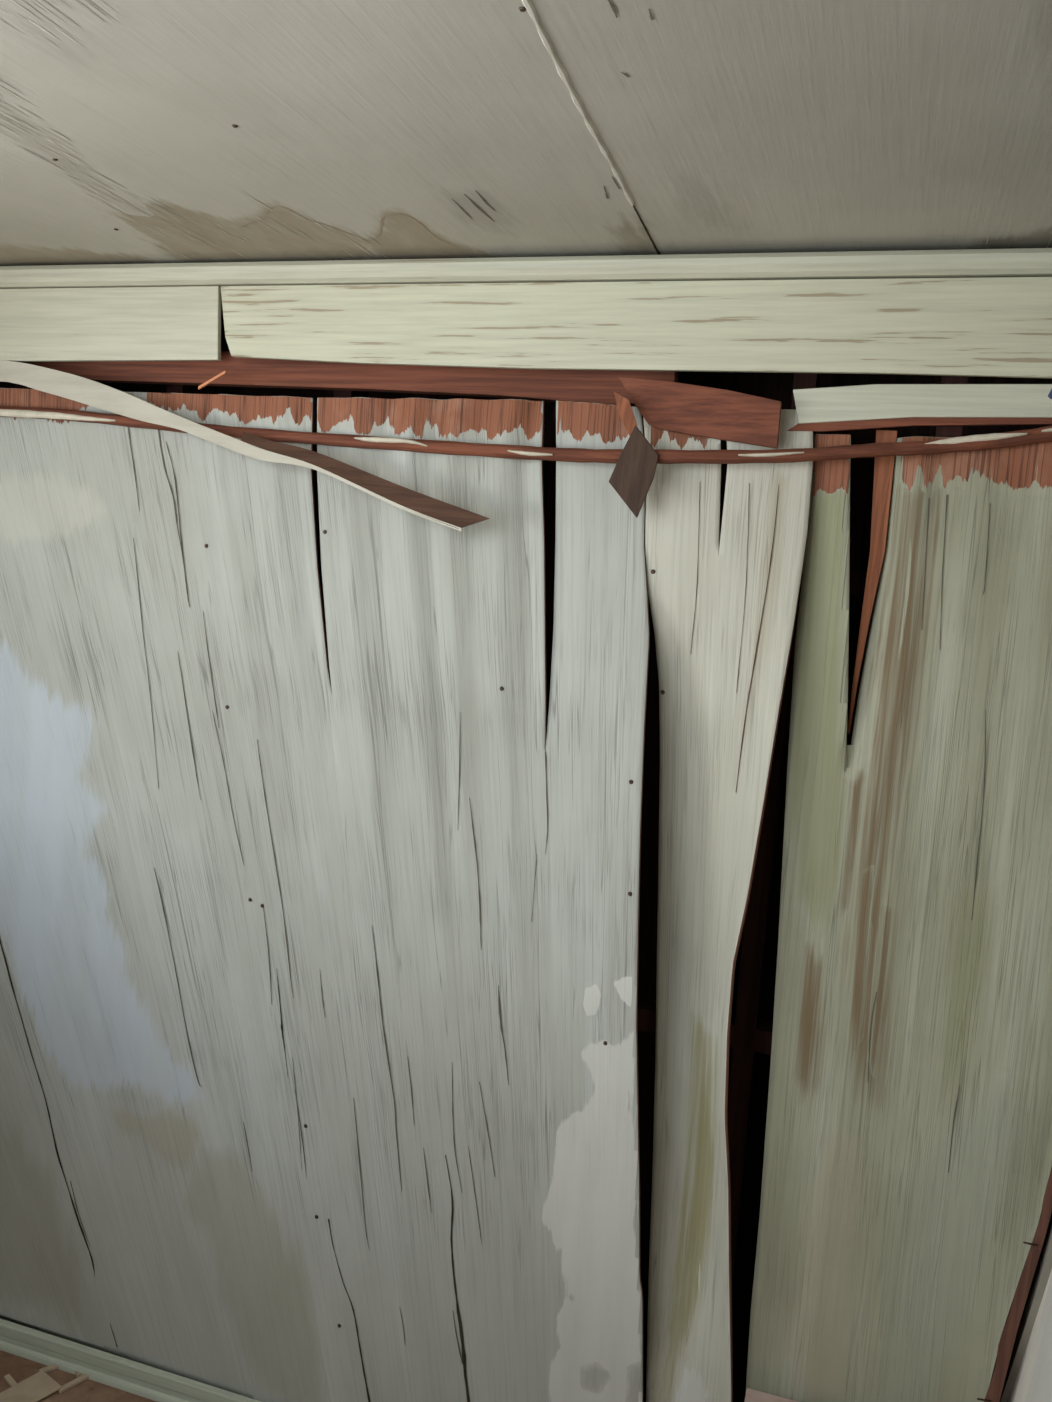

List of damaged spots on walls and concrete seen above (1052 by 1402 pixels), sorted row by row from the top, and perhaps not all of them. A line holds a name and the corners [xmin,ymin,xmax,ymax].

damp [0,192,515,266]
crack [603,177,661,255]
peeling [0,388,116,430]
peeling [142,392,720,456]
peeling [893,428,1052,499]
damp [727,466,800,796]
crack [128,427,325,1172]
crack [458,744,481,941]
damp [768,477,1037,1402]
crack [0,939,95,1277]
crack [372,928,509,1402]
crack [328,1219,370,1402]